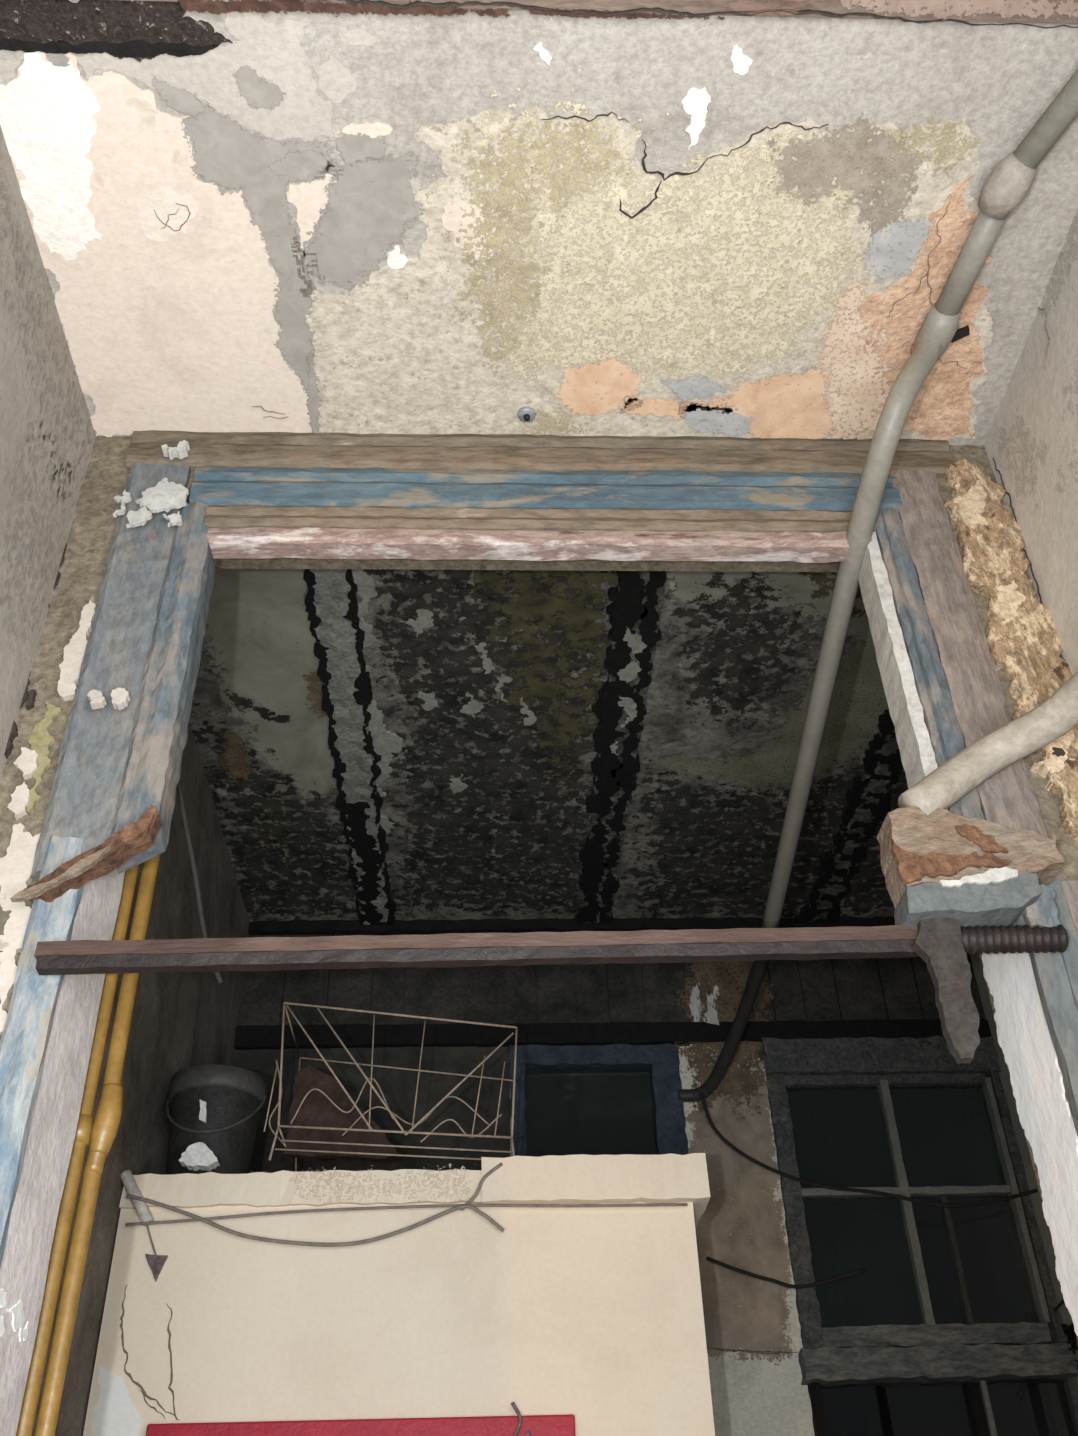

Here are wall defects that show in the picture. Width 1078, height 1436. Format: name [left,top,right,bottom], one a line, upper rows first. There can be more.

peeling [0,0,994,460]
crack [541,111,828,219]
peeling [113,478,189,528]
spalling [943,459,1072,721]
peeling [0,595,131,1041]
spalling [1030,725,1078,842]
peeling [0,1289,29,1342]
crack [120,1285,179,1420]